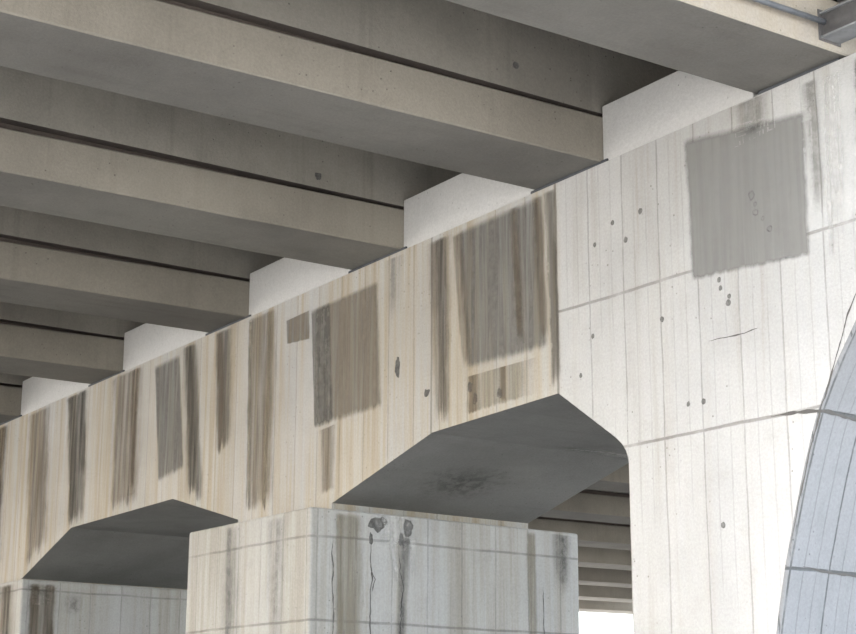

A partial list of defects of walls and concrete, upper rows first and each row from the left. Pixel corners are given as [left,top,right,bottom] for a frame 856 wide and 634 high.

leakage [432,240,446,307]
leakage [541,193,558,379]
leakage [69,392,85,516]
spalling [368,516,387,545]
spalling [399,519,413,546]
leakage [0,587,10,634]
crack [368,553,376,634]
crack [397,544,405,634]